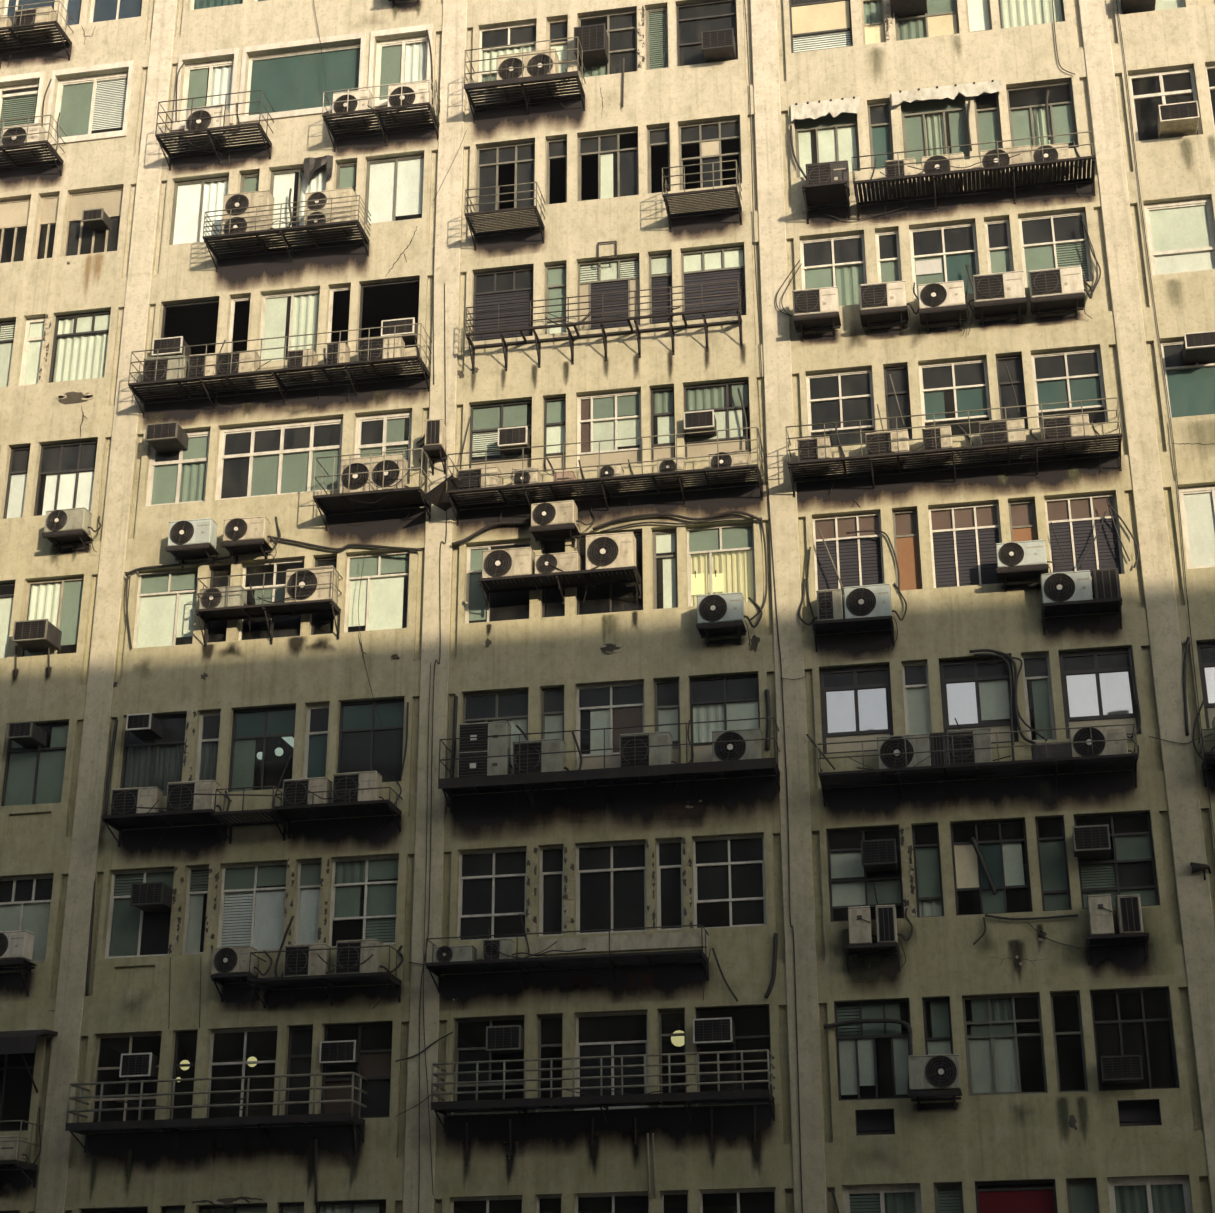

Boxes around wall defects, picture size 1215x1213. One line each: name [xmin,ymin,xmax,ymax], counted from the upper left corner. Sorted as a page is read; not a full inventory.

rust [85,255,102,285]
crack [385,227,417,277]
spalling [56,391,94,404]
leakage [144,377,428,425]
leakage [450,776,779,840]
peeling [205,866,219,954]
leakage [1057,1097,1087,1136]
leakage [444,1104,774,1182]